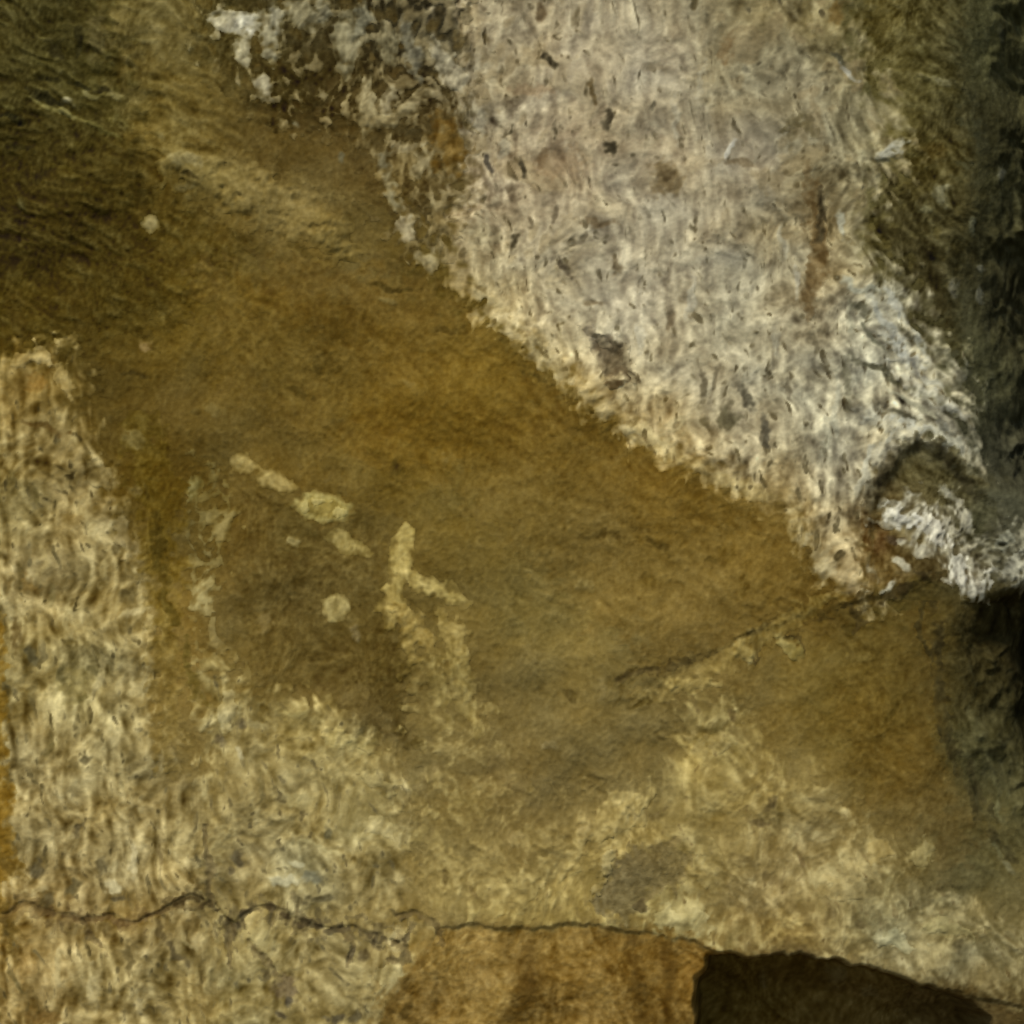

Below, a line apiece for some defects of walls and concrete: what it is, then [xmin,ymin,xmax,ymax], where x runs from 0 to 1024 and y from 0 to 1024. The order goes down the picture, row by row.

crack [0,822,446,983]